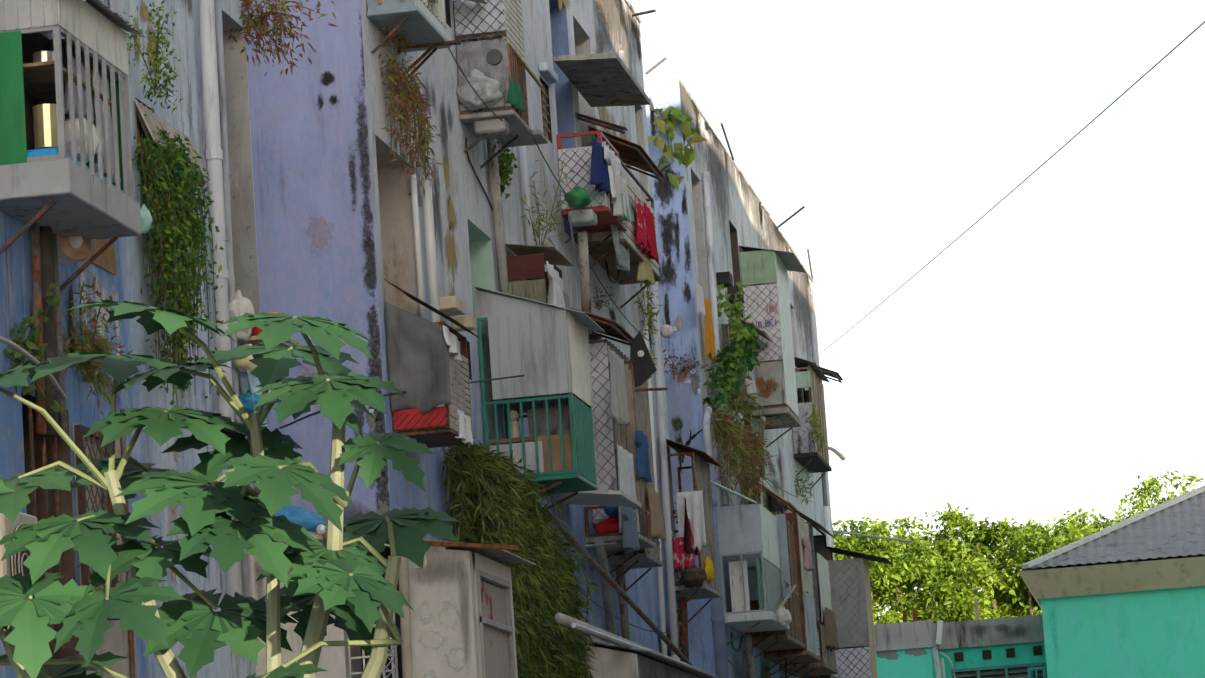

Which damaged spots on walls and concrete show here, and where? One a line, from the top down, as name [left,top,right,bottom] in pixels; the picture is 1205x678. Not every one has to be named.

damp [318,71,339,109]
damp [349,17,382,394]
damp [654,158,691,326]
damp [679,83,790,252]
damp [789,271,815,360]
damp [354,406,390,520]